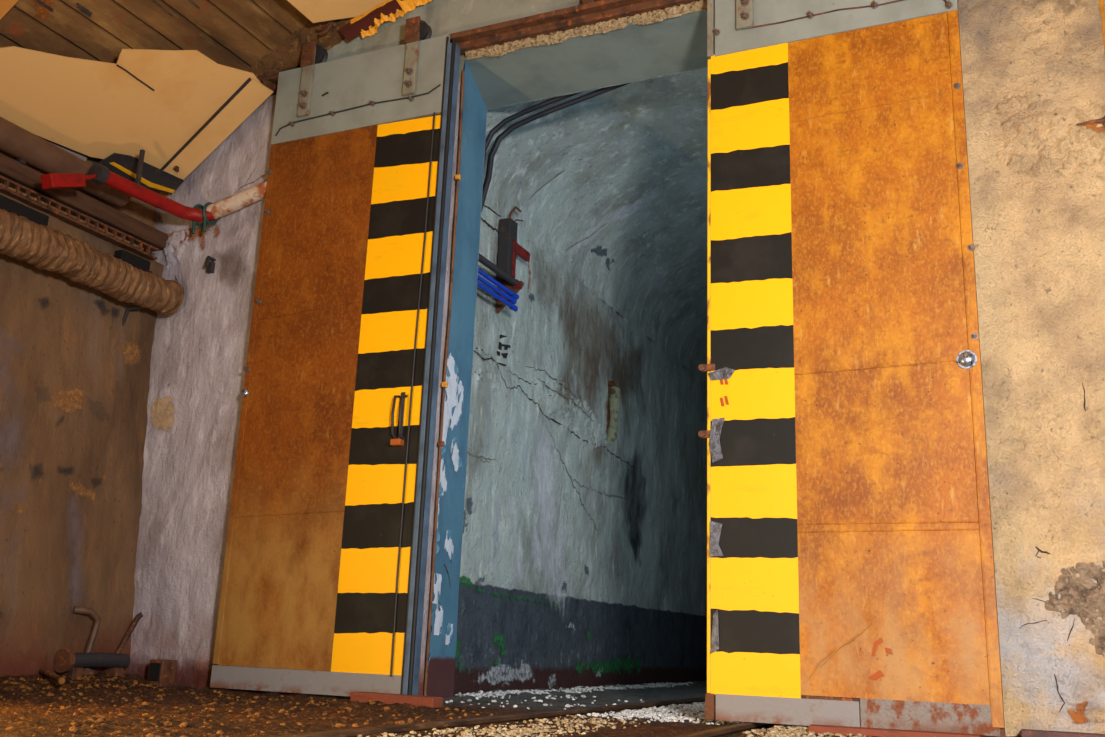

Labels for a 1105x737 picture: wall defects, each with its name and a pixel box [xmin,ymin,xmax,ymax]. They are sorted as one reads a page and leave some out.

spalling [338,0,402,42]
crack [1097,0,1105,54]
rust [218,125,378,671]
peeling [435,353,473,563]
crack [451,348,637,530]
rust [788,12,990,705]
peeling [430,570,471,675]
water stain [473,660,535,685]
flaking render [1020,561,1105,657]
rust [1068,702,1088,724]